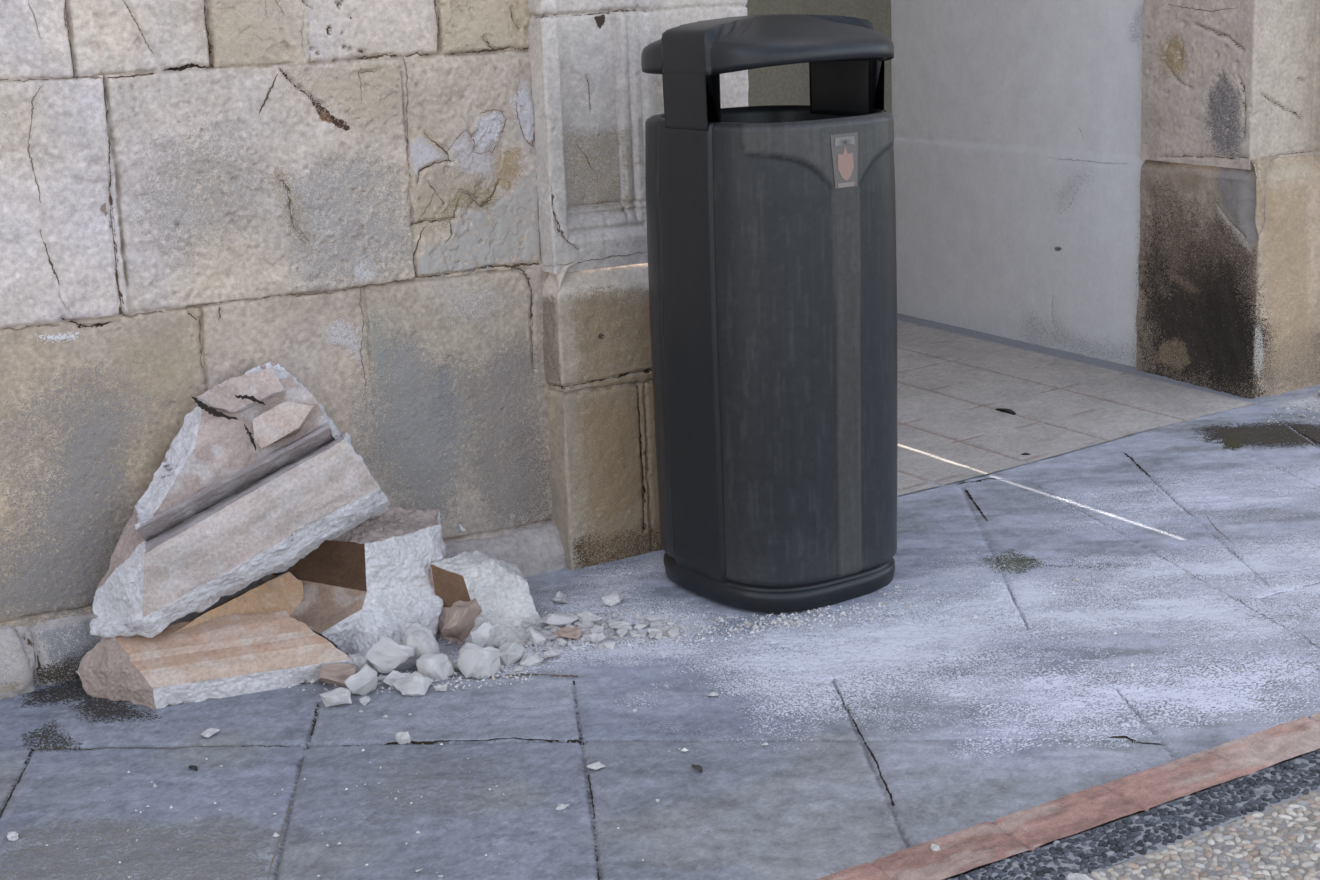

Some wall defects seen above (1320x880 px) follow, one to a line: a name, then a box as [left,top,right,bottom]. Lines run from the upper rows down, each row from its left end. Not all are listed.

crack [0,0,652,530]
spalling [125,77,541,300]
water stain [1190,420,1320,451]